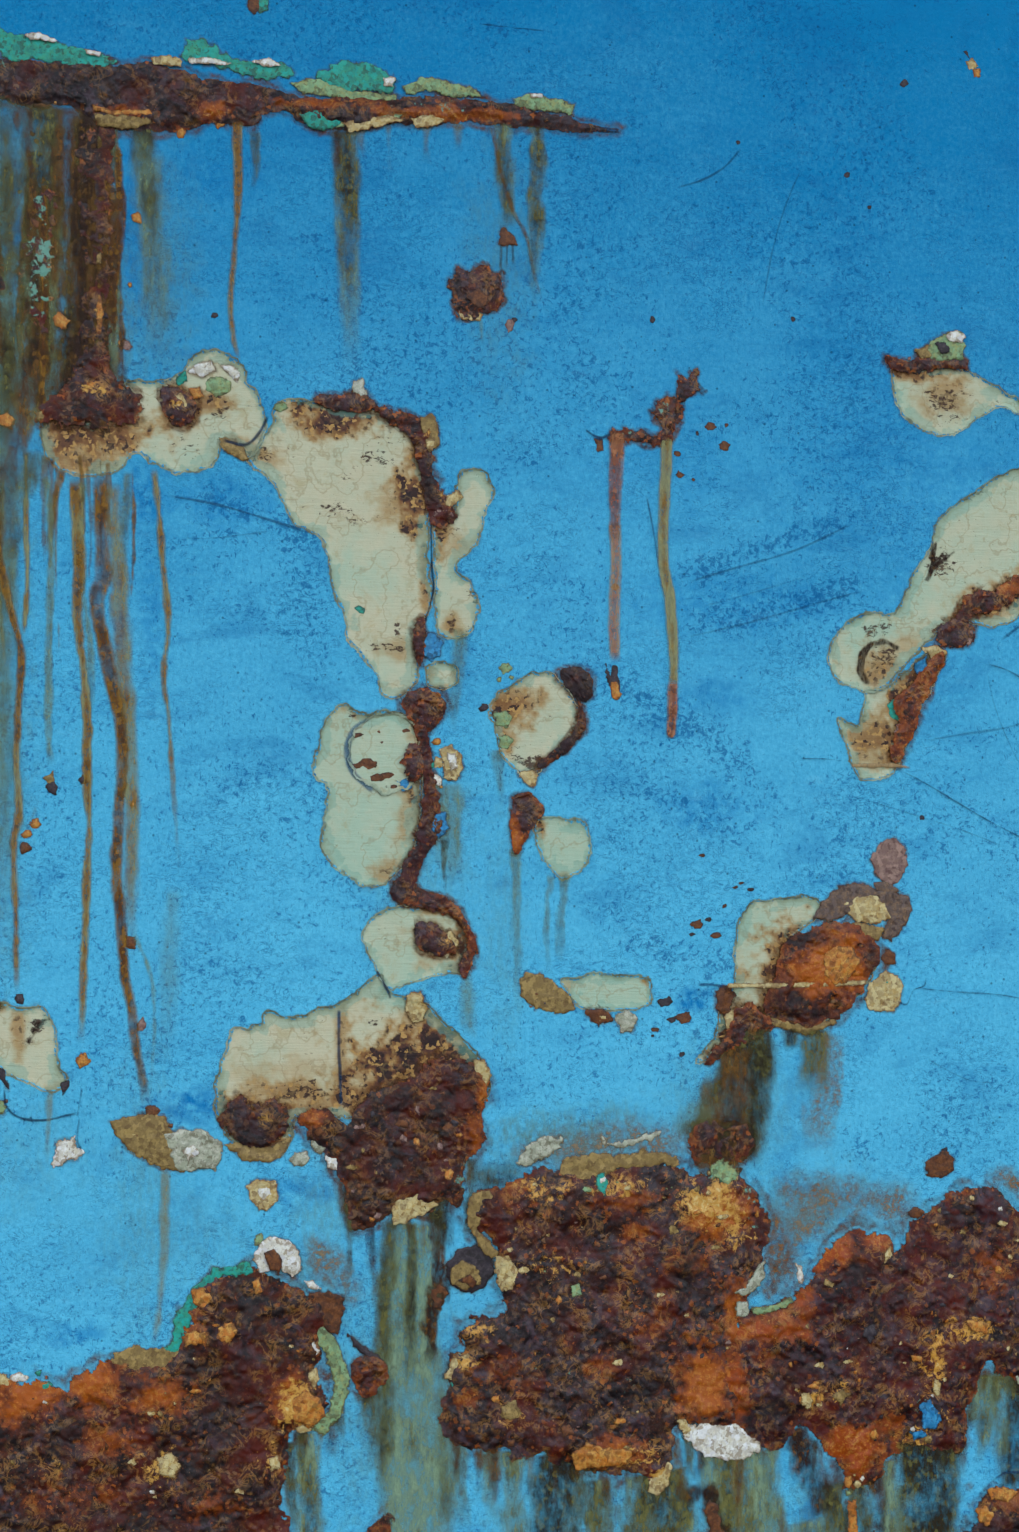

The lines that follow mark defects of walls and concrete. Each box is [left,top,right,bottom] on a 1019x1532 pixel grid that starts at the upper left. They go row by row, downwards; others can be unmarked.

peeling [39,348,495,888]
rust [0,59,619,1087]
peeling [478,663,594,896]
rust [586,368,731,738]
peeling [827,468,1019,781]
rust [0,1233,389,1532]
water stain [284,1418,342,1532]
water stain [339,1181,352,1231]
peeling [212,887,492,1231]
water stain [370,1199,961,1532]
rust [438,1118,1019,1532]
water stain [968,1366,1019,1486]